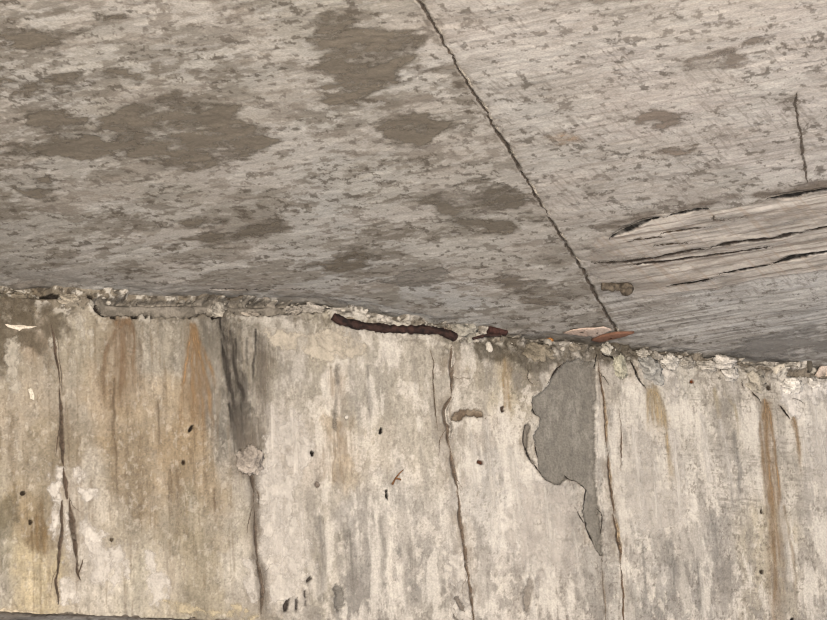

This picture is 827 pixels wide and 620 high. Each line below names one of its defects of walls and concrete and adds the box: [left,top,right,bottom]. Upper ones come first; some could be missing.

damp [14,91,280,171]
damp [307,11,426,106]
crack [417,0,827,332]
spalling [87,296,306,320]
spalling [323,311,458,341]
damp [47,467,72,551]
crack [51,325,83,605]
damp [145,317,322,620]
crack [430,346,474,620]
spalling [522,359,603,556]
crack [523,353,646,620]
corrosion [760,399,781,553]